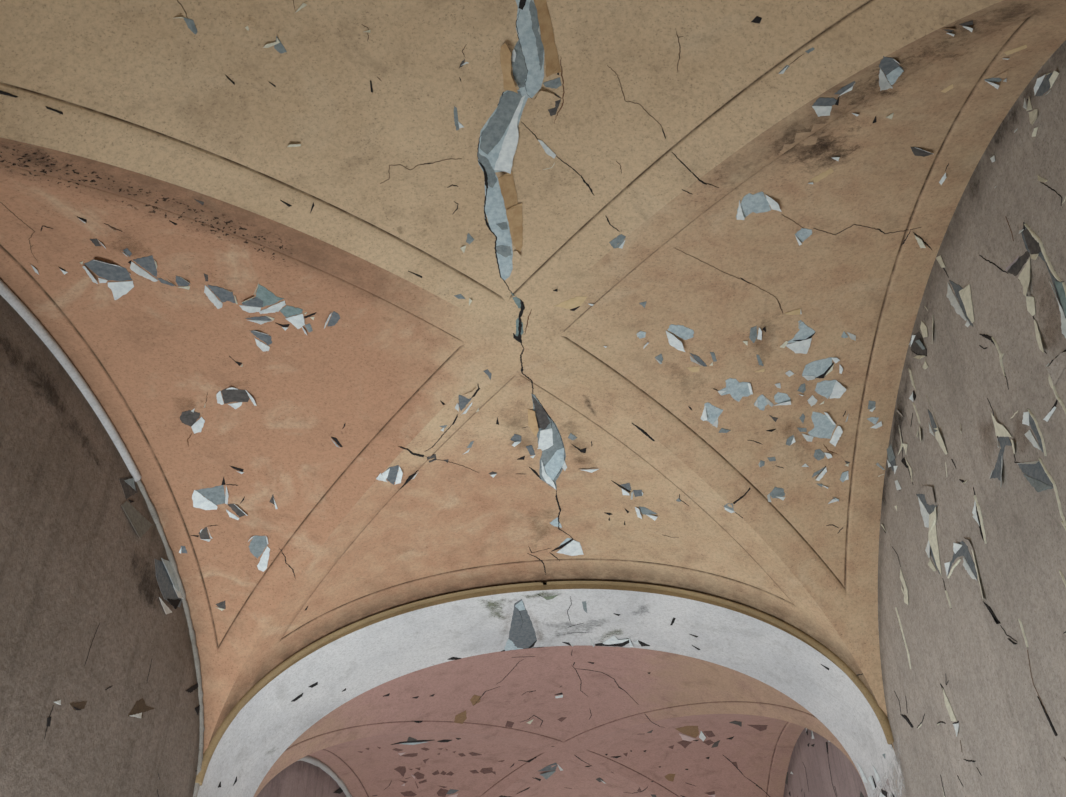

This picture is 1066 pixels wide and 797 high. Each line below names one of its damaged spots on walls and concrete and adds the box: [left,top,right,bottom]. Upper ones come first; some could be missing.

damp [0,148,287,260]
peeling [80,248,190,300]
peeling [204,274,340,352]
crack [380,0,660,727]
peeling [655,324,717,372]
peeling [915,233,1009,390]
peeling [979,216,1066,530]
peeling [180,387,257,446]
peeling [192,466,248,520]
peeling [876,306,1057,736]
spalling [501,599,541,652]
peeling [357,737,481,797]